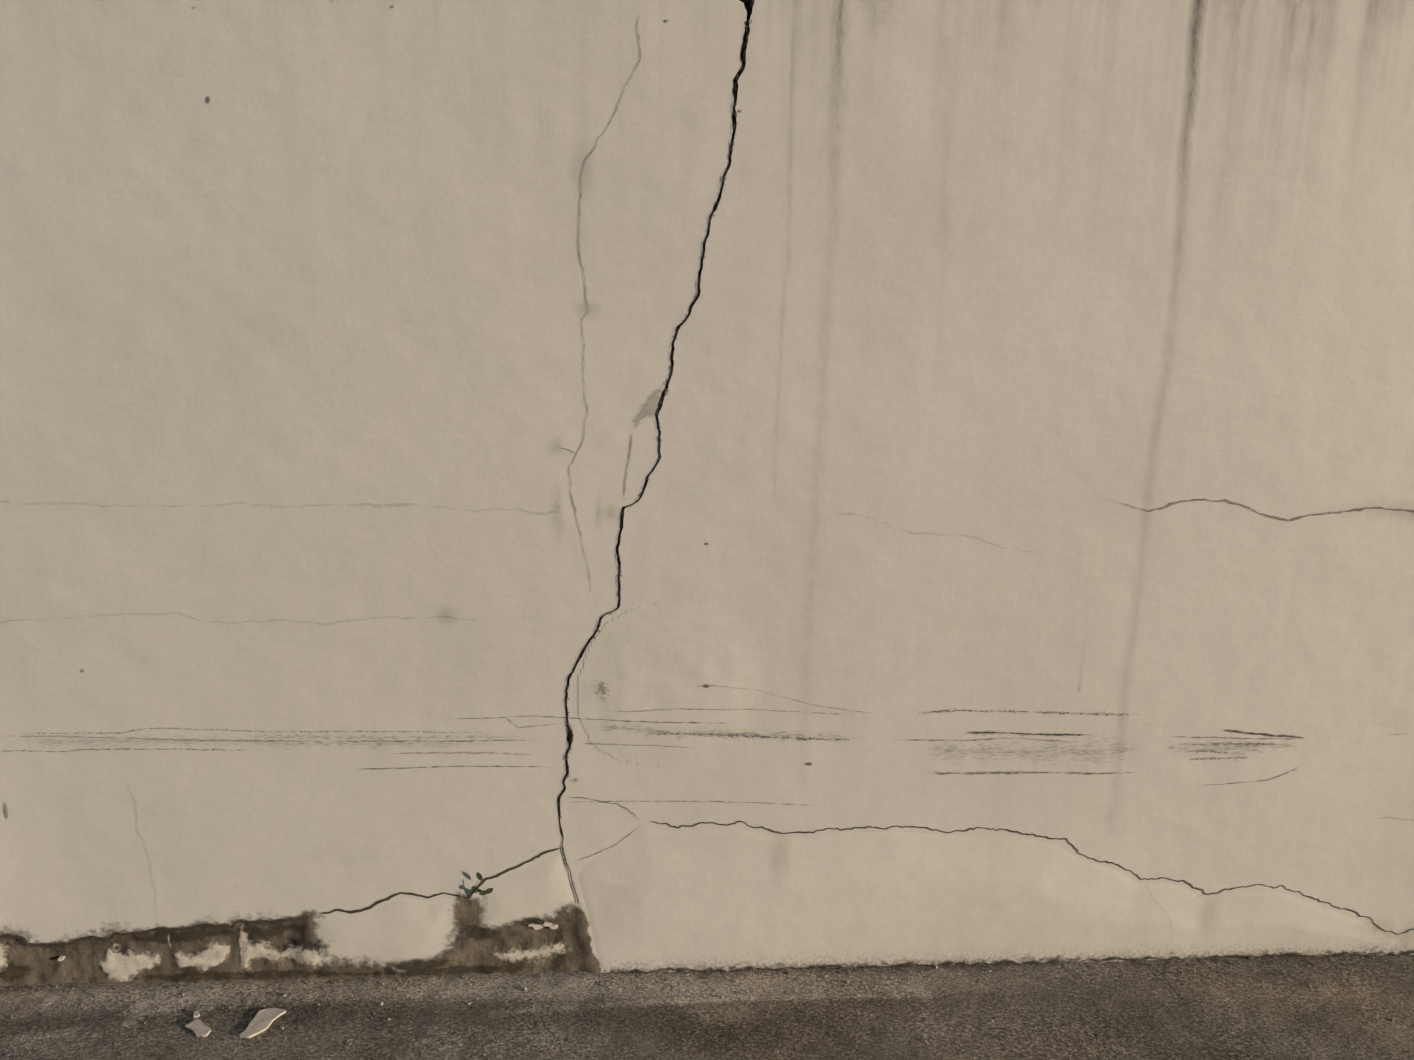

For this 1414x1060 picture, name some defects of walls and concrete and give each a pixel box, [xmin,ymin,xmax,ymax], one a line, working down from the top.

crack [320,7,1414,935]
spalling [0,895,601,986]